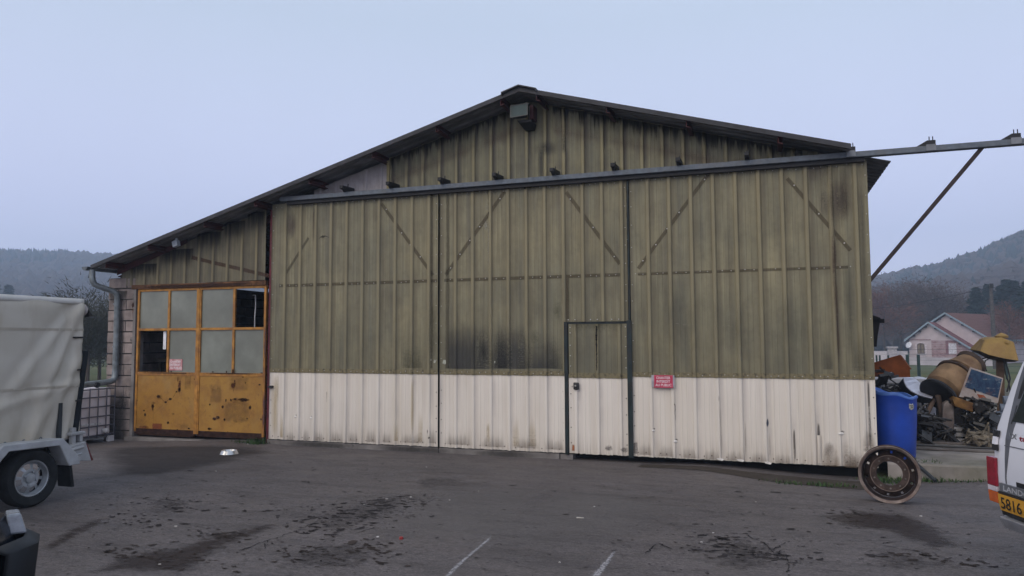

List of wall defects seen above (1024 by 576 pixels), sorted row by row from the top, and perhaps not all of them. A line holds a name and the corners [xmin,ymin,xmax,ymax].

rust [208,369,261,438]